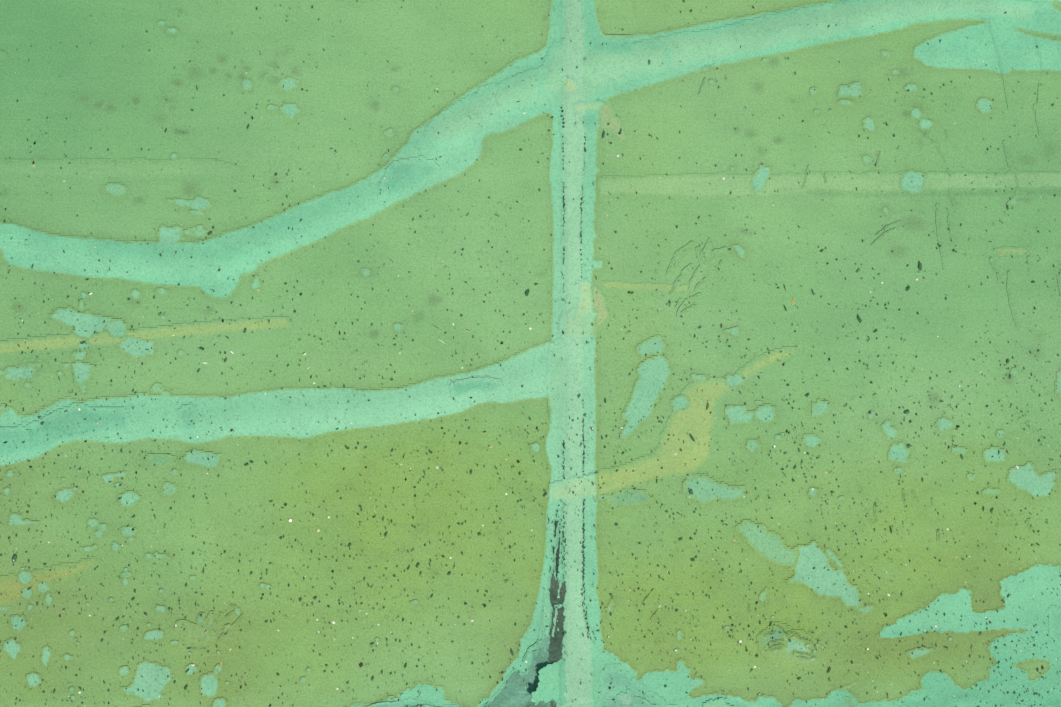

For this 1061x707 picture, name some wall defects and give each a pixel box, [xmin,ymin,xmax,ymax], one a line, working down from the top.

peeling [582,0,1061,104]
peeling [583,129,603,283]
peeling [0,0,568,707]
peeling [584,339,598,475]
spalling [619,335,691,439]
spalling [683,474,745,507]
spalling [966,430,1058,500]
peeling [584,488,1061,707]